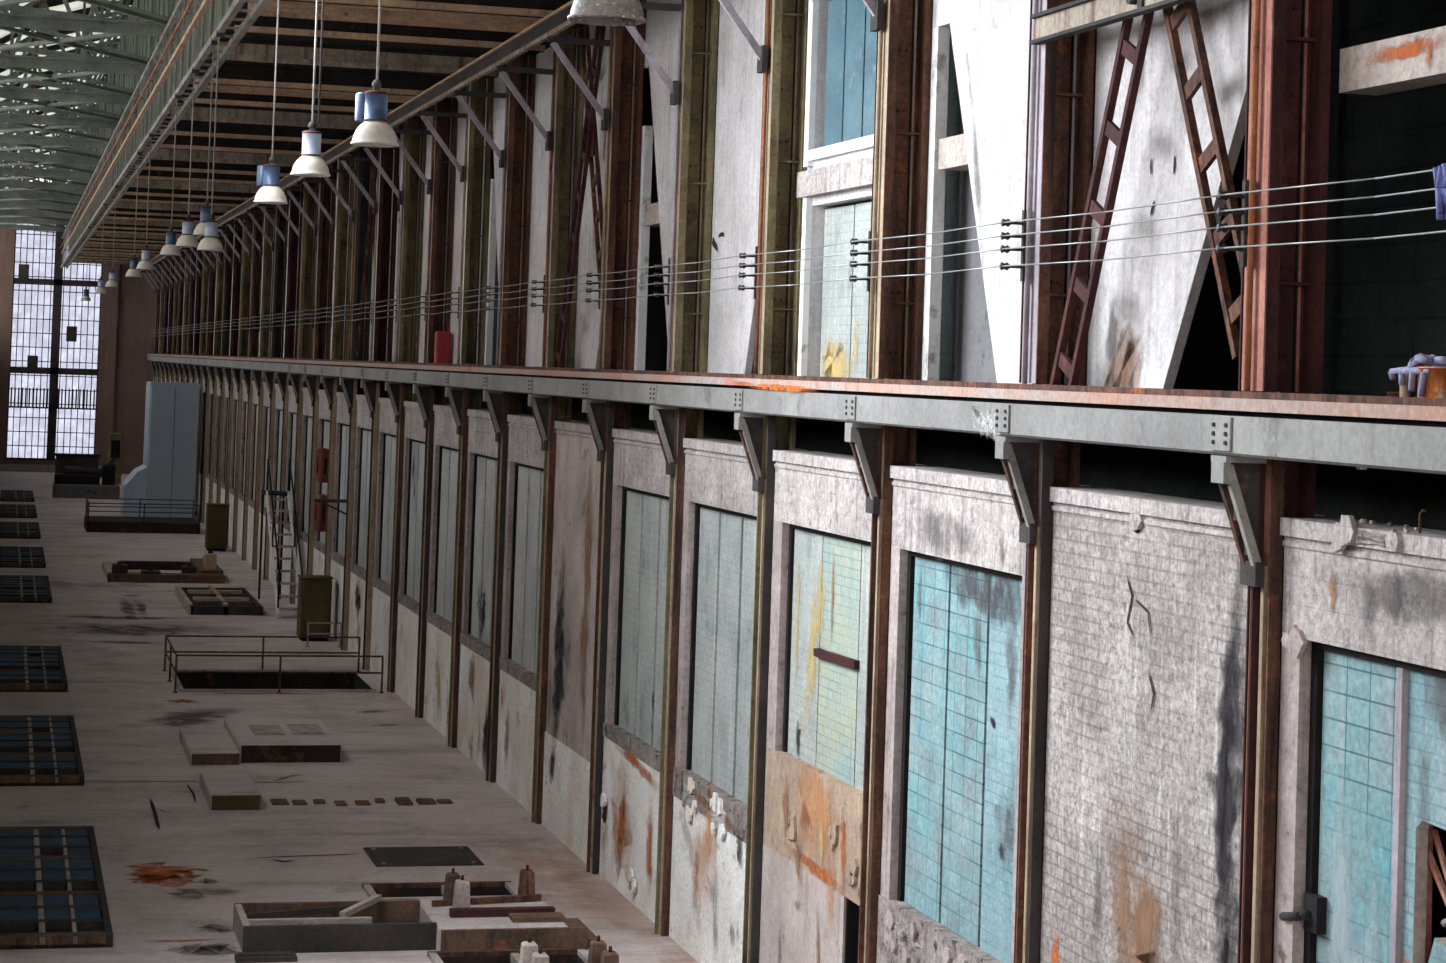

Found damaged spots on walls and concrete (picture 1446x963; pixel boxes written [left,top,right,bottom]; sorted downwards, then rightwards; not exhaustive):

corrosion [1378,39,1431,65]
crack [1126,578,1151,635]
leakage [1370,575,1446,618]
crack [1147,671,1155,710]
corrosion [624,751,651,783]
leakage [1218,702,1242,840]
corrosion [602,796,629,853]
corrosion [783,775,844,909]